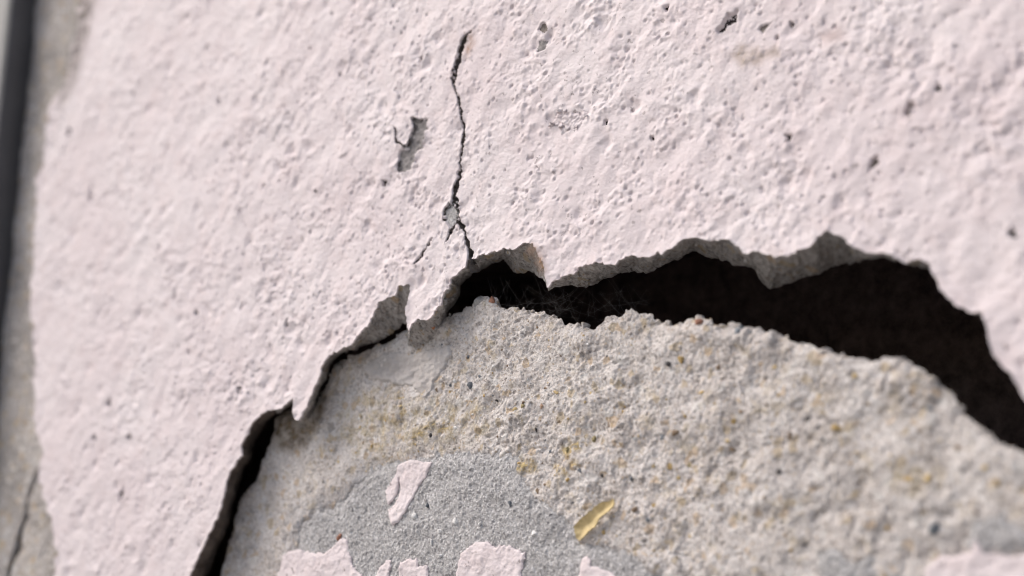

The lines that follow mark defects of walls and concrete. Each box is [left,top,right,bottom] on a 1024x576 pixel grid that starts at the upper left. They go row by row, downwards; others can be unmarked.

crack [207,323,407,576]
spalling [191,231,1024,576]
crack [414,31,1024,452]